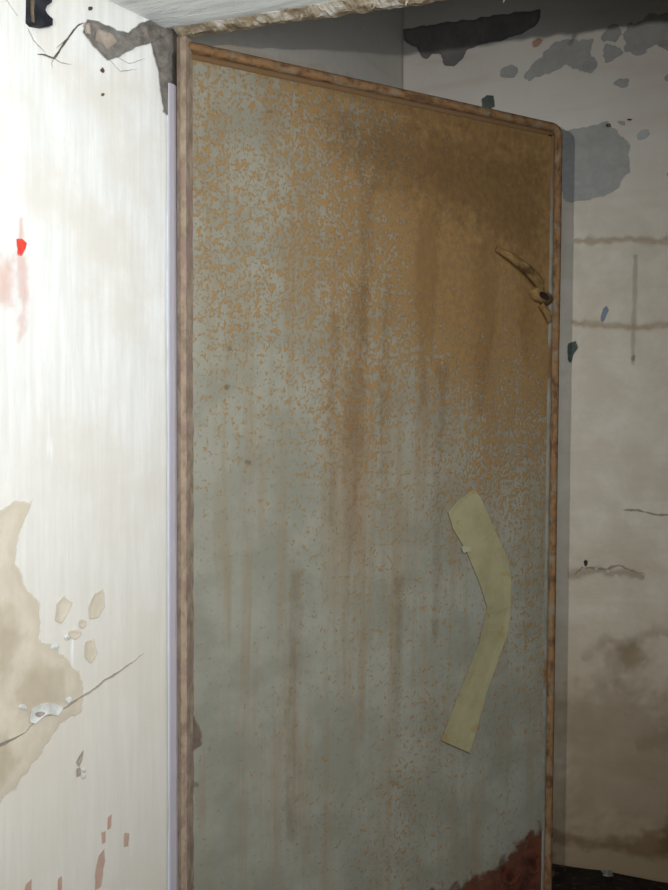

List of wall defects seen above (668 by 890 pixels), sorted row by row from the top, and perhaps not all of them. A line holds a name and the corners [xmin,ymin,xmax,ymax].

crack [6,0,83,68]
peeling [83,20,173,115]
peeling [500,13,668,81]
peeling [561,119,649,202]
crack [624,508,668,516]
damp [0,502,82,801]
peeling [50,590,105,663]
crack [0,656,140,746]
rust [193,717,201,750]
rust [452,830,555,890]